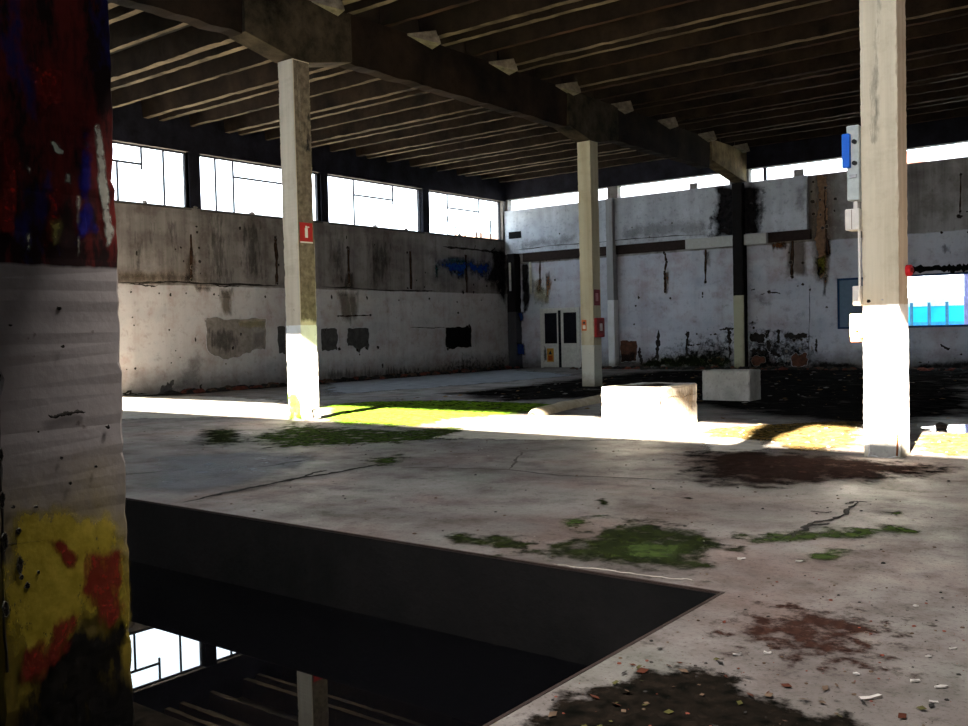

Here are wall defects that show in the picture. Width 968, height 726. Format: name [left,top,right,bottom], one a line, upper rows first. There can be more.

flaking render [195,317,286,365]
crack [756,501,866,539]